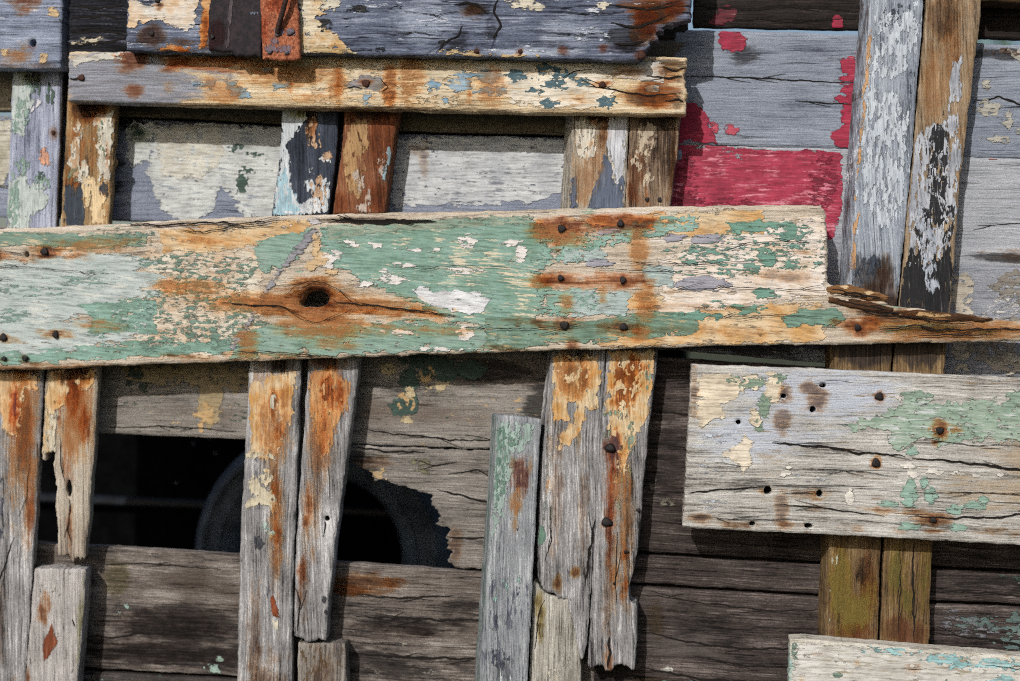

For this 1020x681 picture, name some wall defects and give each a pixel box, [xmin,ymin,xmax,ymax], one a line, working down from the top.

corrosion [220,278,414,347]
peeling [0,0,1020,537]
corrosion [534,217,581,245]
corrosion [597,215,653,259]
crack [600,237,1020,337]
corrosion [557,345,589,390]
corrosion [615,356,647,405]
corrosion [11,375,38,493]
crack [649,437,1020,531]
peeling [252,522,275,549]
crack [897,542,1020,670]
peeling [791,608,1020,681]